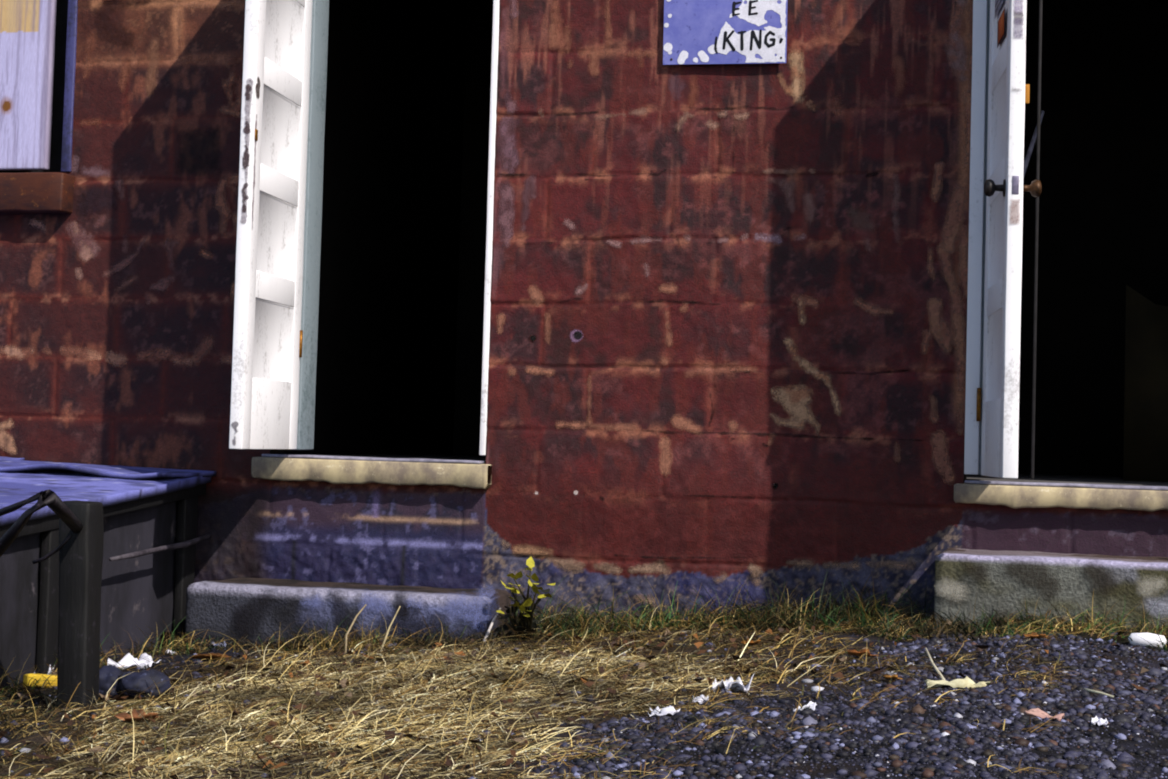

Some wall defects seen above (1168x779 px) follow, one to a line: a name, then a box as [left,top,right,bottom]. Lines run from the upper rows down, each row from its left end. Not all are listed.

peeling [0,336,213,367]
peeling [772,339,839,430]
peeling [0,420,16,453]
spalling [502,542,666,574]
spalling [749,564,762,585]